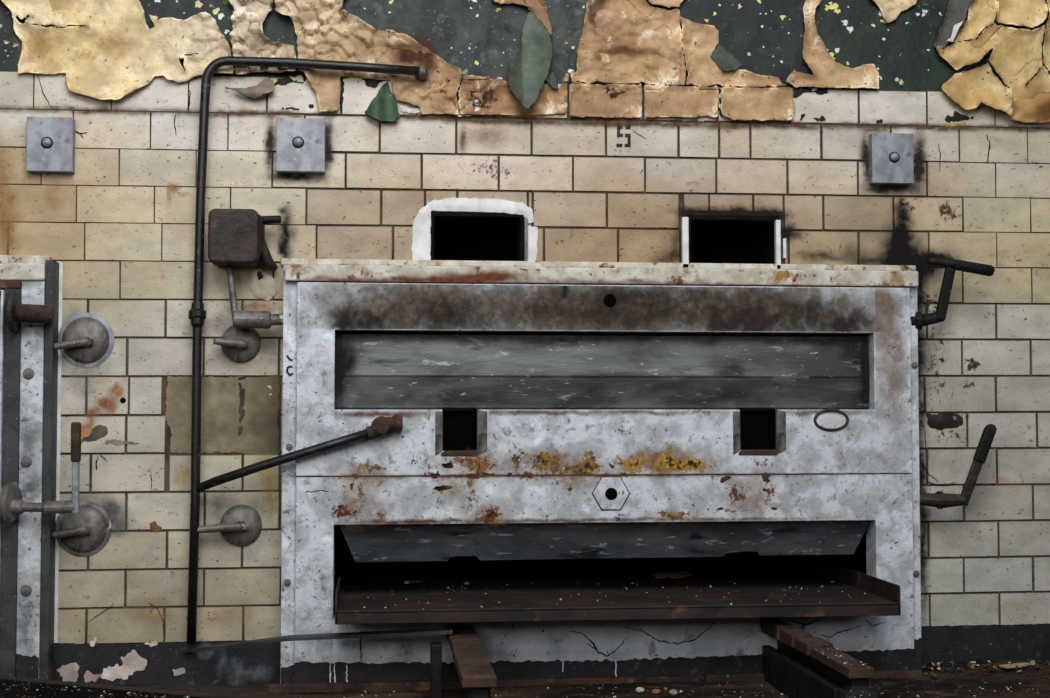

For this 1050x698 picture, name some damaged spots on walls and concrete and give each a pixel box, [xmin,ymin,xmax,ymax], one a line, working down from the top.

peeling [0,0,1050,123]
rust [330,272,517,282]
rust [83,386,122,428]
rust [373,410,778,526]
rust [332,463,407,518]
crack [571,622,715,657]
peeling [57,641,158,683]